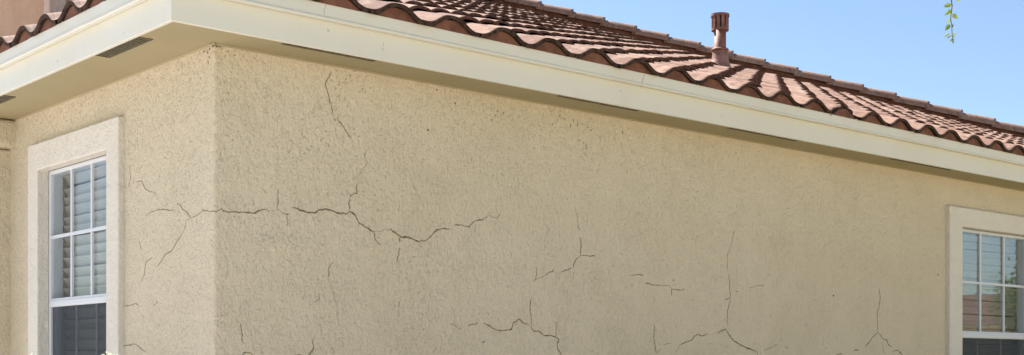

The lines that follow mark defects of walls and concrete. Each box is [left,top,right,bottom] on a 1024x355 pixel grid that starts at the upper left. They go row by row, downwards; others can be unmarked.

crack [124,72,501,306]
crack [450,207,594,355]
crack [631,230,788,355]
crack [837,291,902,355]